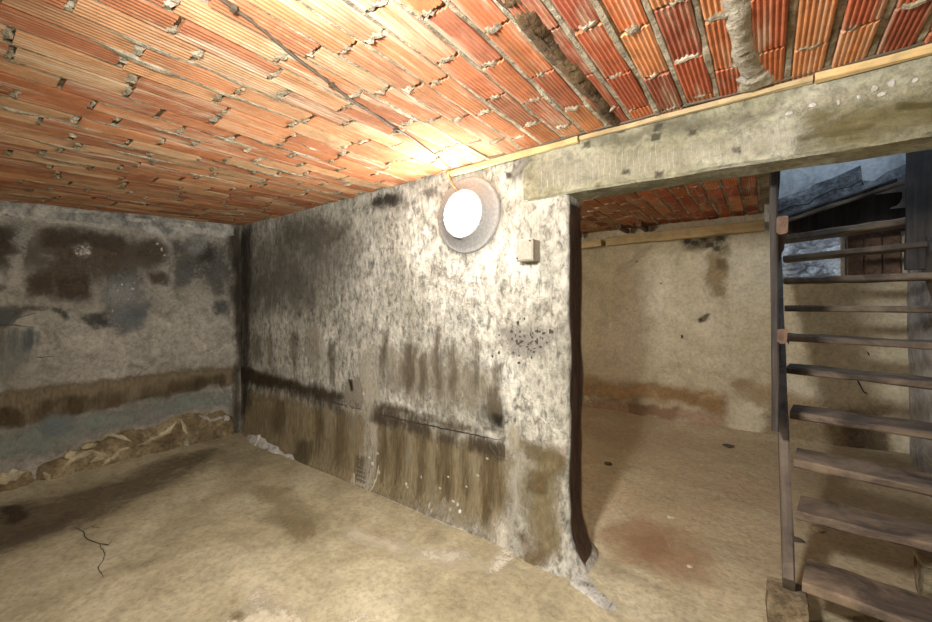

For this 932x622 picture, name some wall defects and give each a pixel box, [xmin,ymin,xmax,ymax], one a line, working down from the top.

flaking render [0,410,234,492]
damp [0,227,565,573]
damp [582,399,725,428]
crack [74,526,111,576]